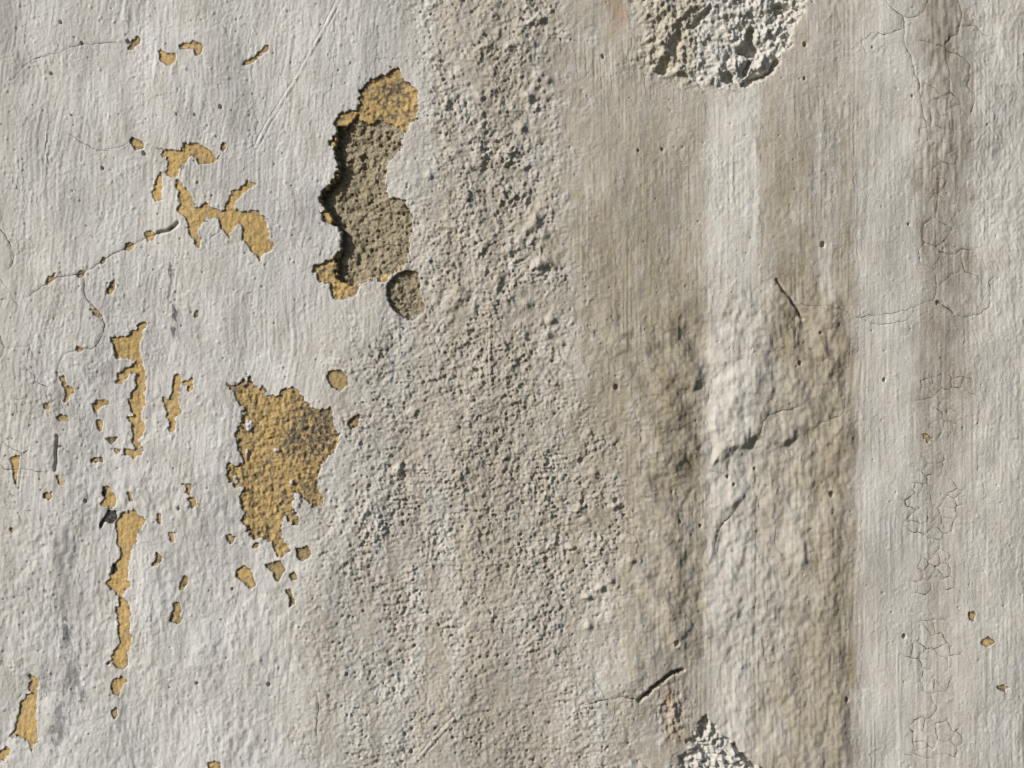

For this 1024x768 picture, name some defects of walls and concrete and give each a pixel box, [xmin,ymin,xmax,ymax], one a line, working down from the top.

peeling [159,40,203,66]
flaking render [621,0,813,95]
peeling [152,142,275,261]
flaking render [312,68,425,321]
crack [778,0,992,335]
peeling [93,322,148,459]
peeling [162,374,194,432]
peeling [226,376,360,607]
peeling [100,486,175,719]
peeling [0,674,39,761]
crack [584,669,683,705]
flaking render [678,716,762,768]